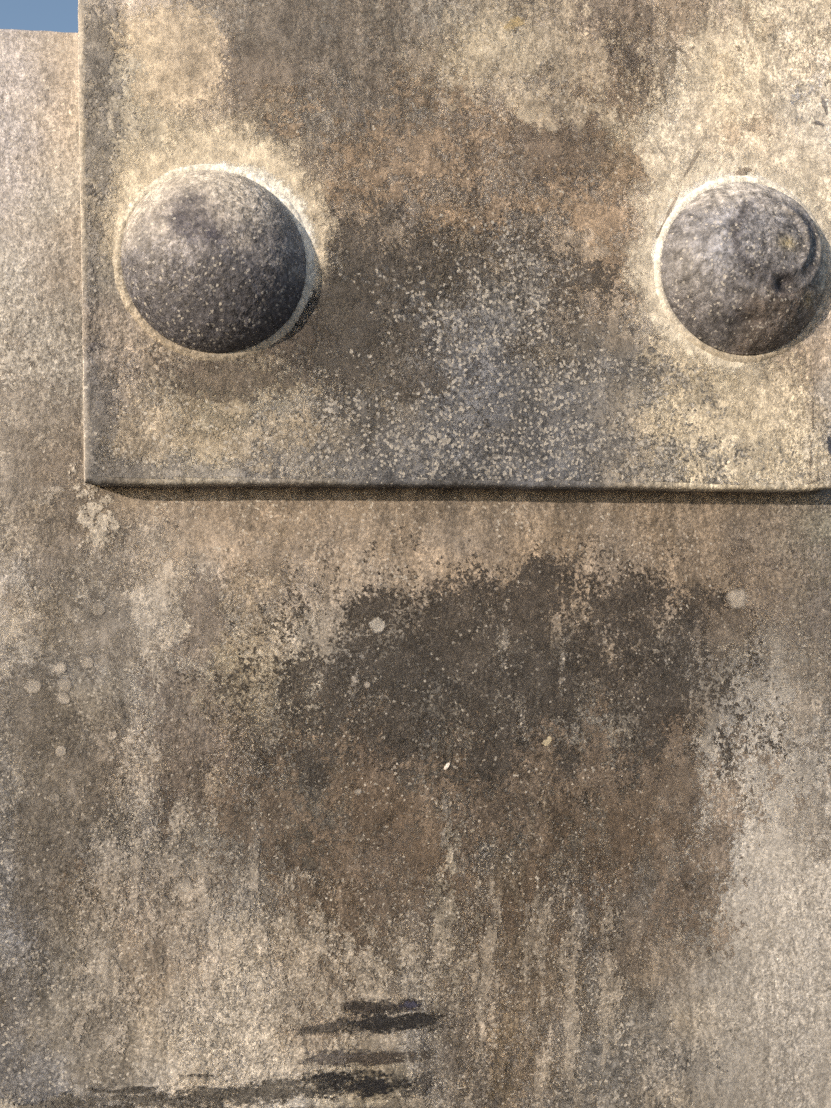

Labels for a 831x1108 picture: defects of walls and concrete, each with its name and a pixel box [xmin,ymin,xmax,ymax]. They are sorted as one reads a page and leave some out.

damp [0,299,831,1108]